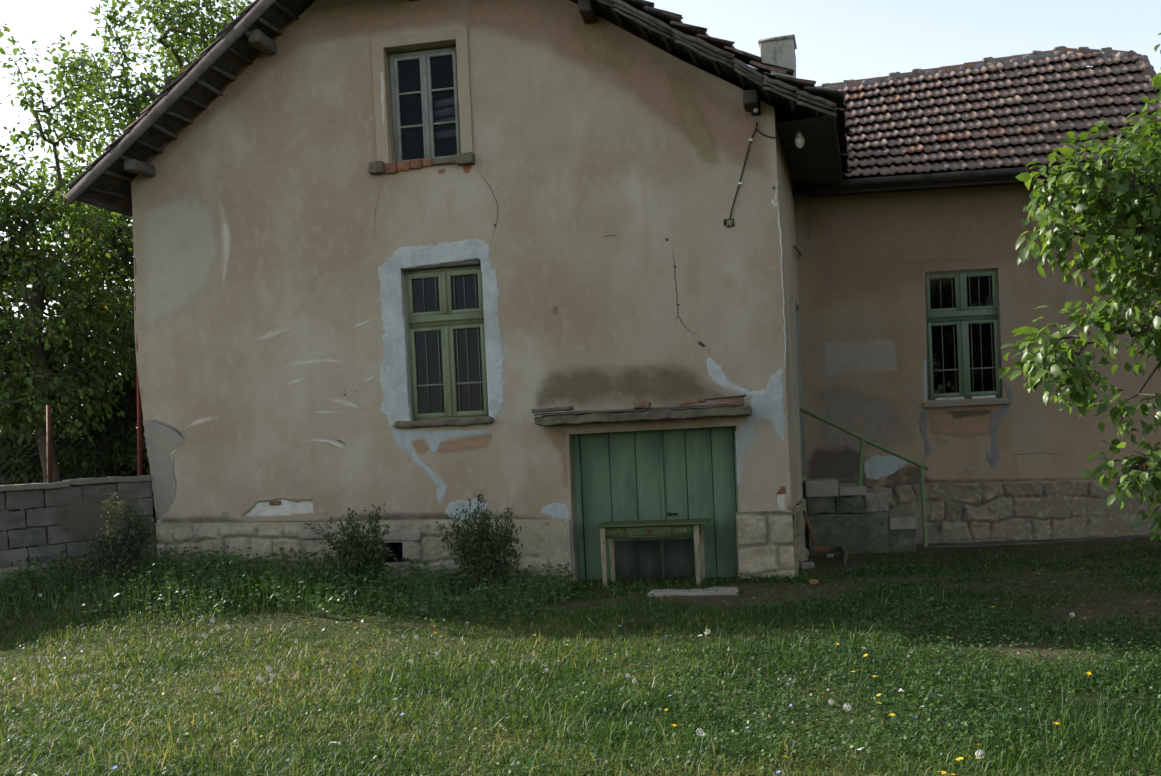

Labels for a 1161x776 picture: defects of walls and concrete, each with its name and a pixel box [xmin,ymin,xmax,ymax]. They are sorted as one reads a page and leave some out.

crack [480,174,498,242]
crack [665,238,710,353]
flaking render [241,496,314,517]